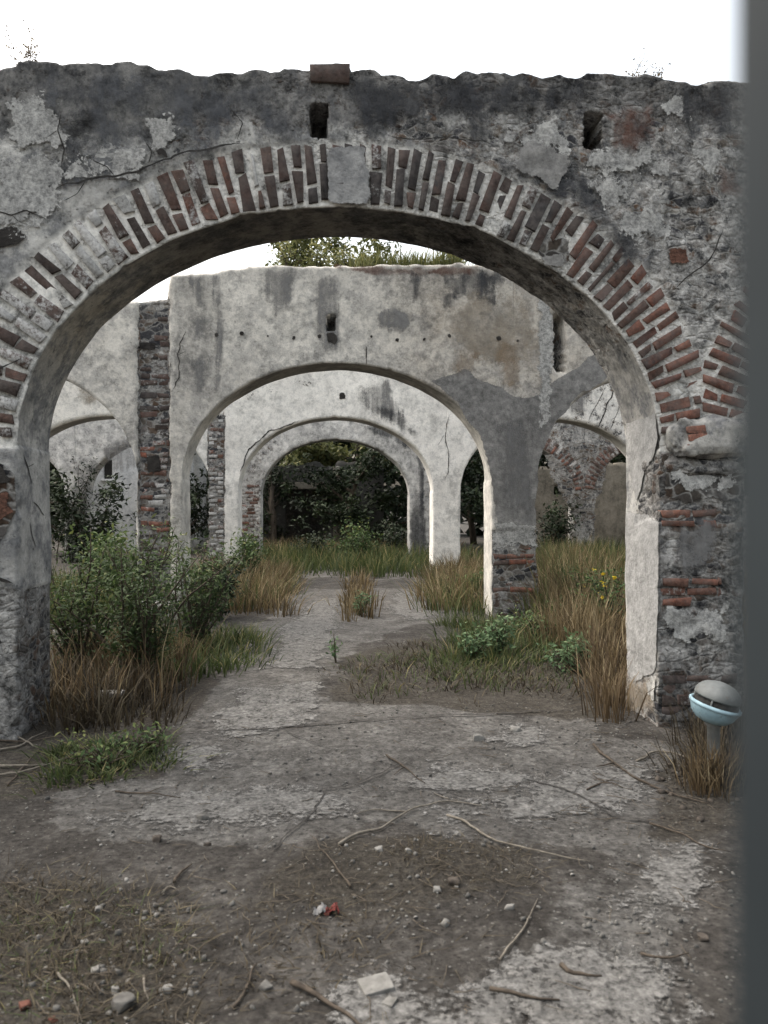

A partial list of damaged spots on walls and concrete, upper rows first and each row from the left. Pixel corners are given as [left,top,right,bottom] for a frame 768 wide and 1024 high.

flaking render [0,88,185,247]
crack [48,106,244,200]
flaking render [503,120,571,164]
flaking render [585,144,689,263]
flaking render [661,95,696,140]
crack [677,231,723,287]
crack [173,331,186,389]
leakage [362,380,412,449]
spalling [0,464,16,539]
flaking render [626,511,730,701]